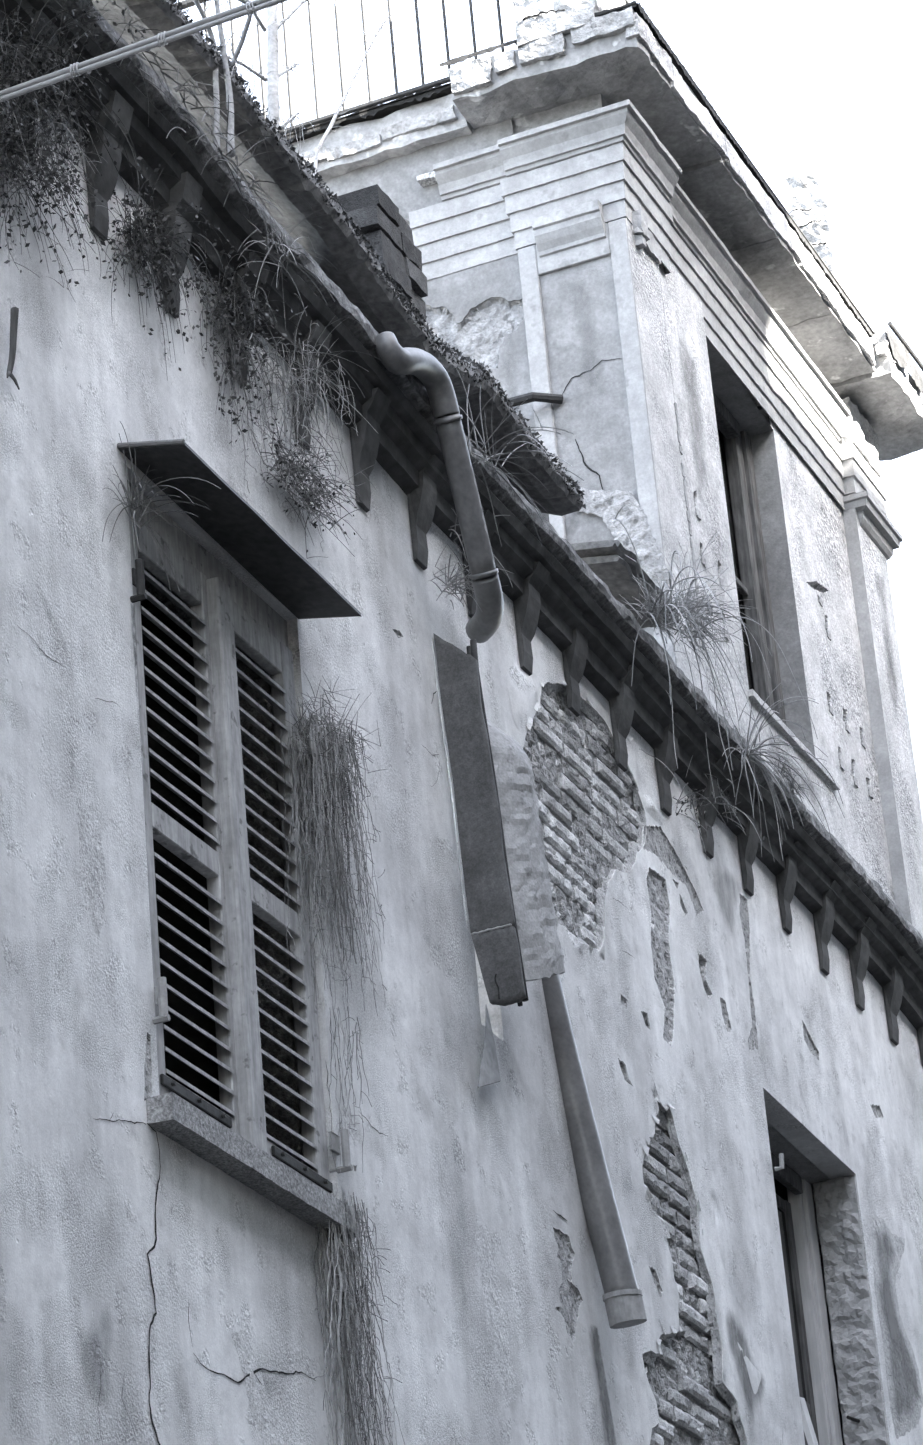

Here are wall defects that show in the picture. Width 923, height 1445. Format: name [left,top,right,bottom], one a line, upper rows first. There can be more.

flaking render [425,297,524,369]
crack [562,358,620,394]
crack [575,439,603,490]
flaking render [523,675,703,1046]
crack [93,1115,316,1445]
flaking render [553,1228,582,1341]
flaking render [642,1083,747,1445]